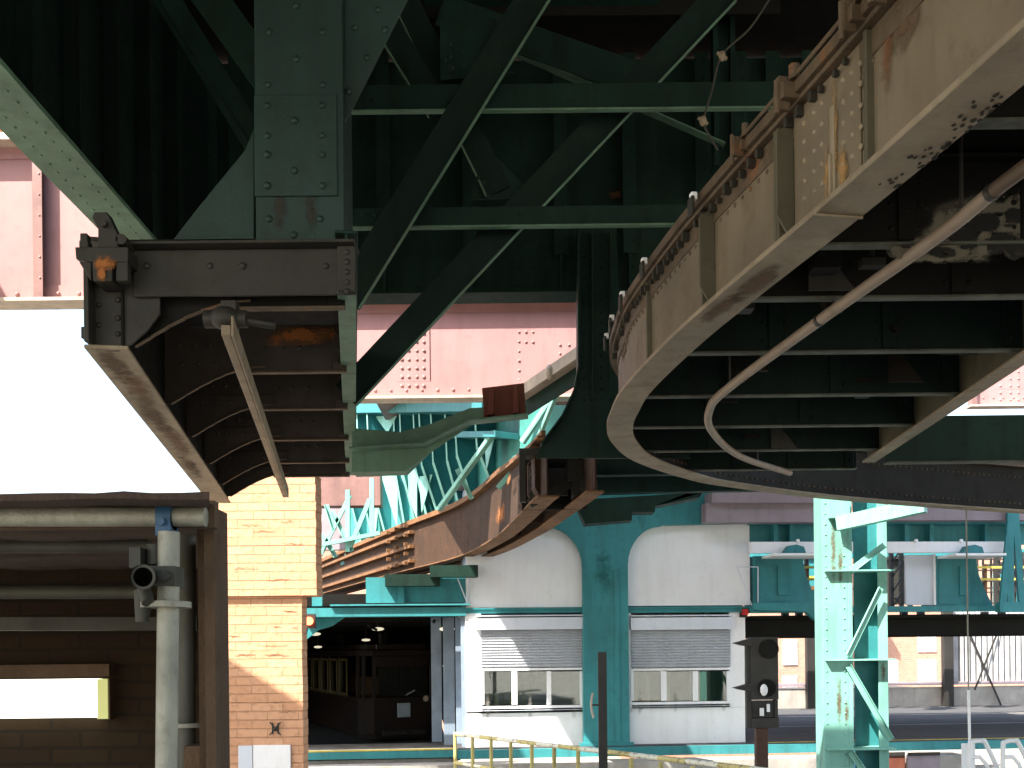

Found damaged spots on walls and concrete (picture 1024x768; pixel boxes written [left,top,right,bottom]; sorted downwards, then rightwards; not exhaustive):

rust [95,258,114,279]
rust [272,327,334,345]